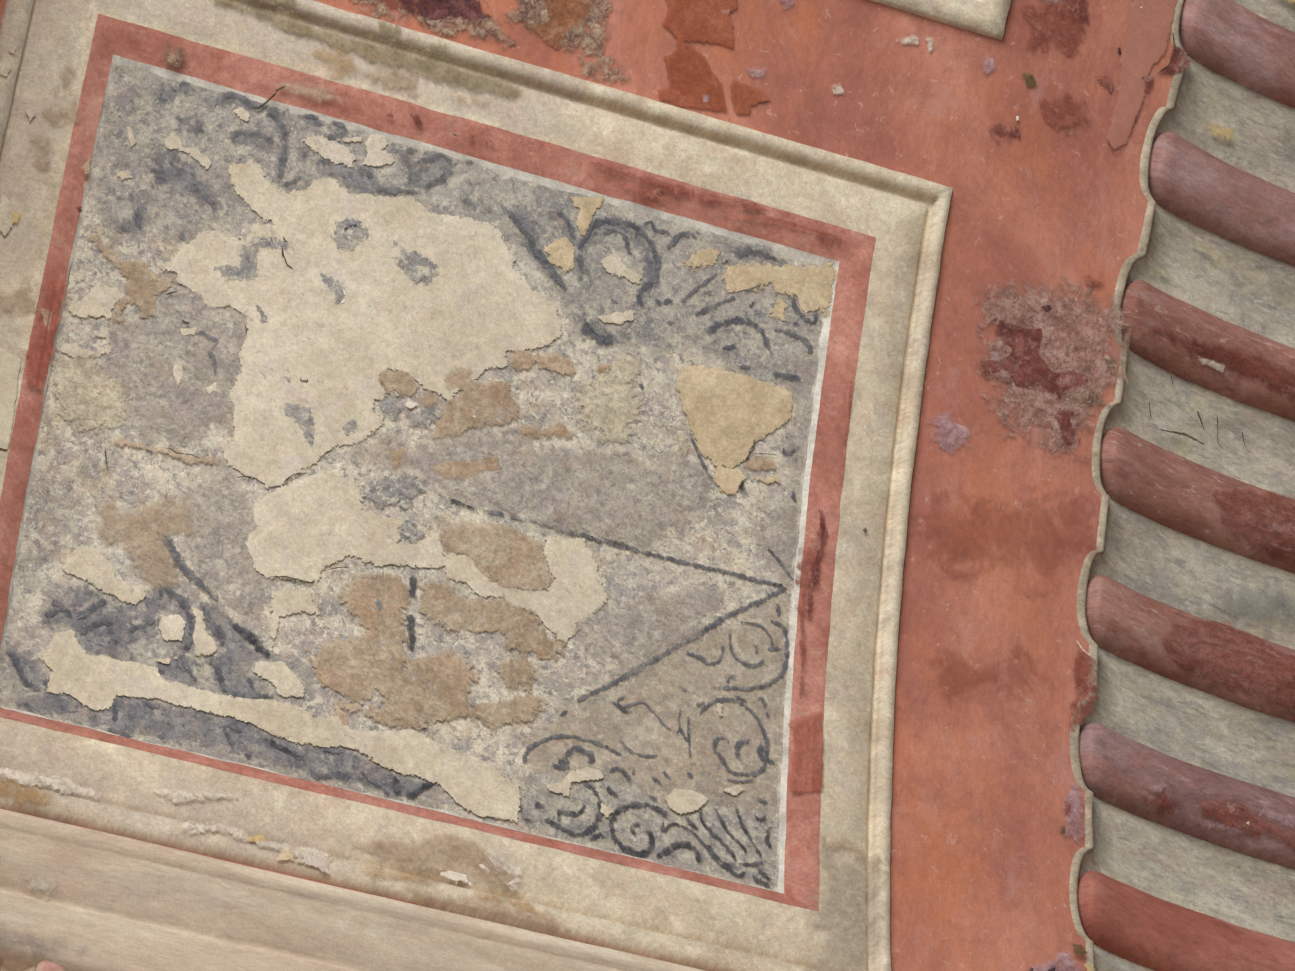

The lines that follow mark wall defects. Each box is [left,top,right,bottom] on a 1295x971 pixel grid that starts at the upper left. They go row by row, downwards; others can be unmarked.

peeling [215,0,520,98]
spalling [1157,34,1190,75]
peeling [278,83,341,102]
peeling [1023,73,1036,88]
peeling [234,107,250,121]
peeling [678,246,837,321]
peeling [26,131,794,823]
peeling [0,767,100,799]
peeling [181,820,331,874]
peeling [355,834,523,890]
spalling [1029,953,1095,971]